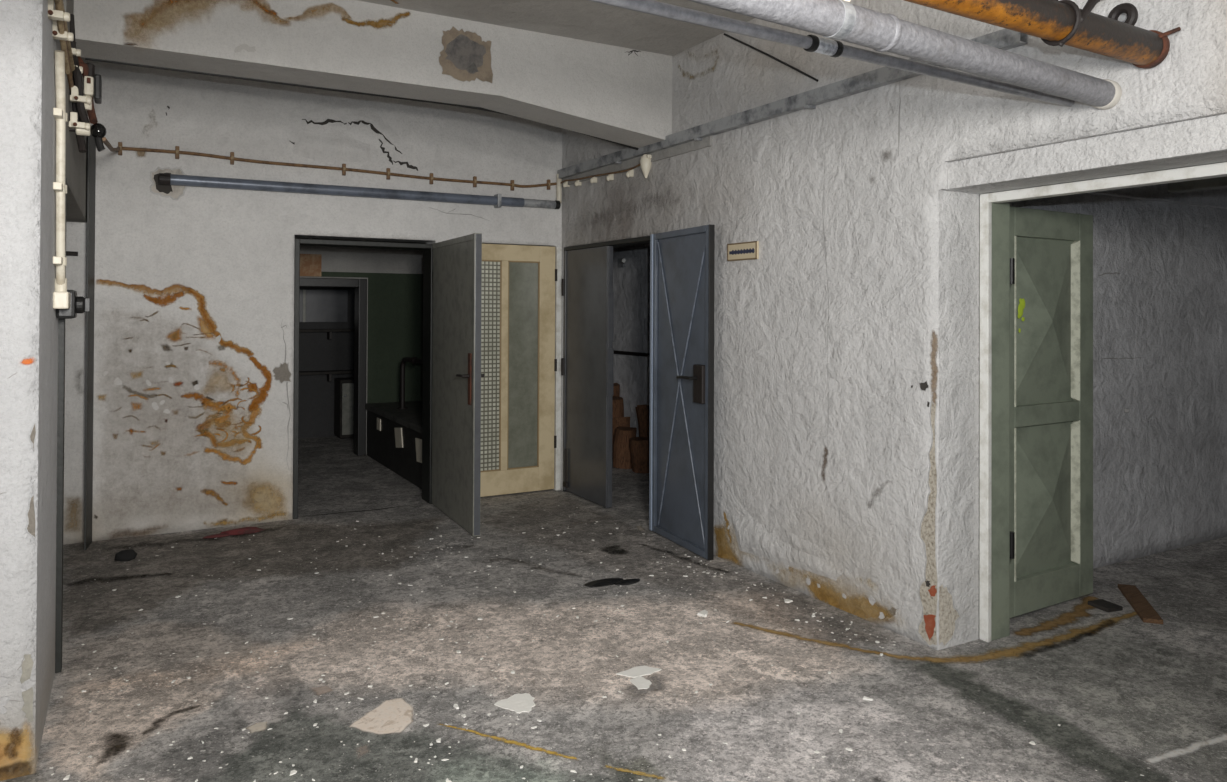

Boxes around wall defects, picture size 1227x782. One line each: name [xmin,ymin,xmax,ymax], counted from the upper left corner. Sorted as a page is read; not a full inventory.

peeling [438,26,493,84]
crack [289,109,418,171]
spalling [904,380,960,648]
damp [789,567,888,620]
spalling [868,595,899,620]